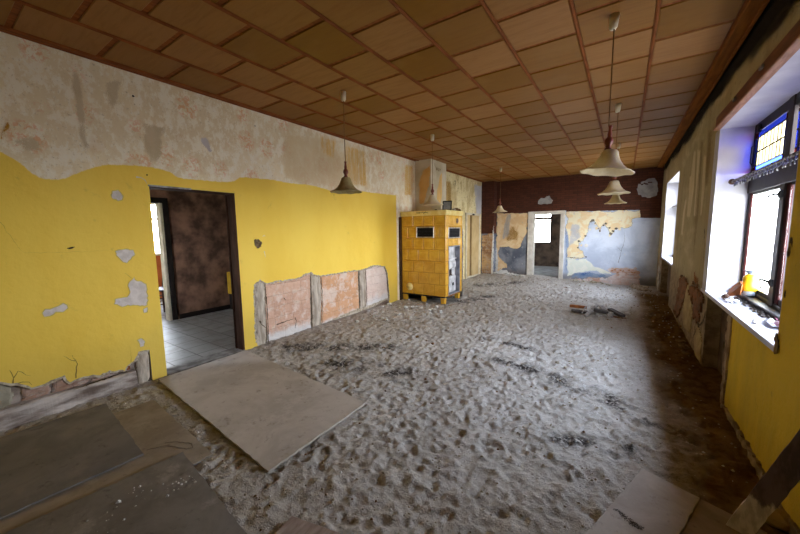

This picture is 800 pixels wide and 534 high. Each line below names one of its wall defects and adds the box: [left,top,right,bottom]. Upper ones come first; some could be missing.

flaking render [637,178,658,198]
peeling [115,248,135,263]
peeling [491,213,528,274]
peeling [565,210,641,285]
peeling [42,303,68,317]
peeling [114,277,149,313]
flaking render [253,265,390,346]
flaking render [673,275,705,363]
flaking render [0,338,150,431]